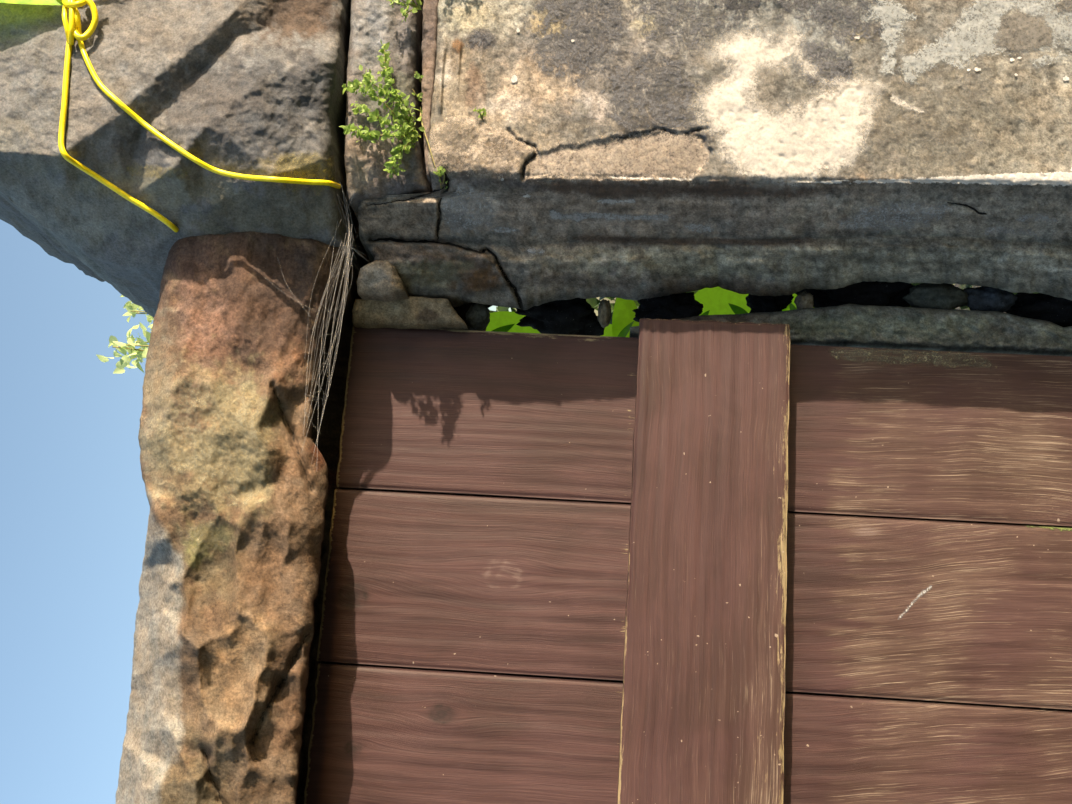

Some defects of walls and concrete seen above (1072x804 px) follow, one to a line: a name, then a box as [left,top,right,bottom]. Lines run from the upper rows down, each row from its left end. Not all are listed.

water stain [539,0,924,222]
crack [509,131,539,180]
water stain [573,224,816,245]